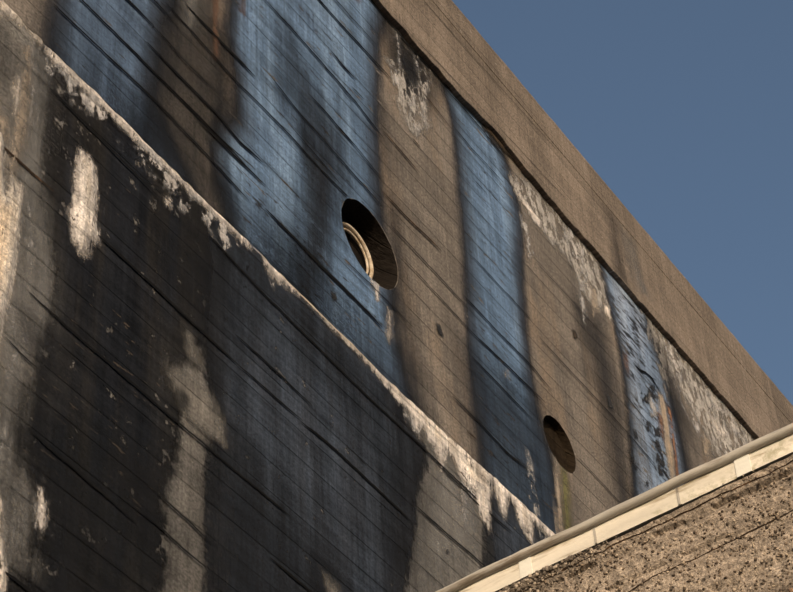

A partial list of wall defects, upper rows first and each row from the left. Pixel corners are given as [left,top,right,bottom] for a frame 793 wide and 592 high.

crack [4,146,53,191]
peeling [387,52,431,136]
spalling [480,122,514,160]
damp [0,0,565,544]
peeling [509,174,611,321]
peeling [641,309,753,476]
damp [231,470,338,592]
crack [521,460,793,592]